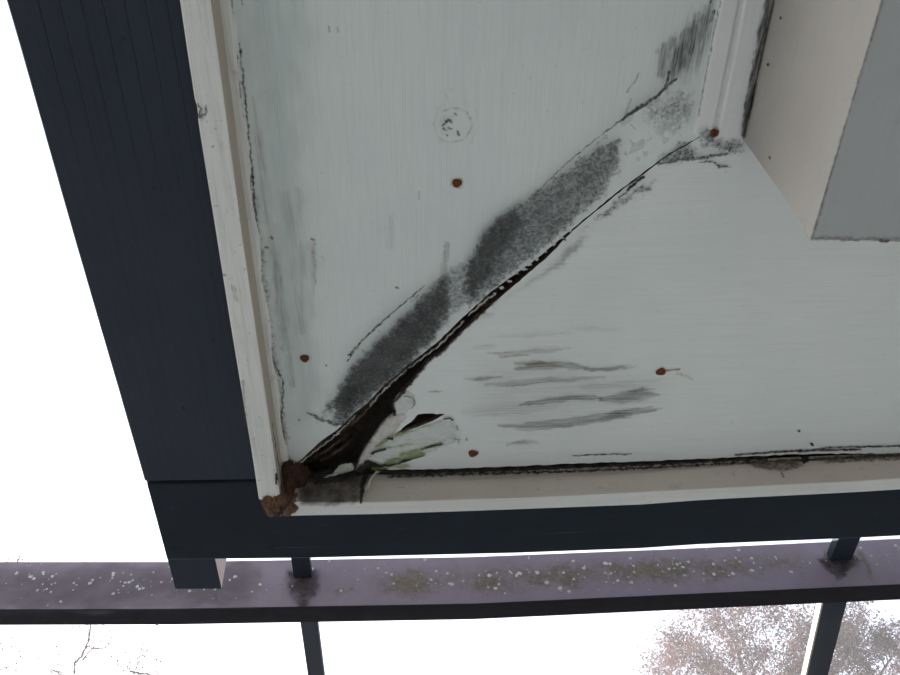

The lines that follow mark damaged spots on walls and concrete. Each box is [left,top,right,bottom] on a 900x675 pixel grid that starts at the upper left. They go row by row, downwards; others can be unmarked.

crack [536,71,678,195]
water stain [599,176,651,216]
water stain [657,0,771,168]
peeling [324,392,467,493]
water stain [307,139,621,426]
peeling [370,230,572,406]
crack [301,239,900,478]